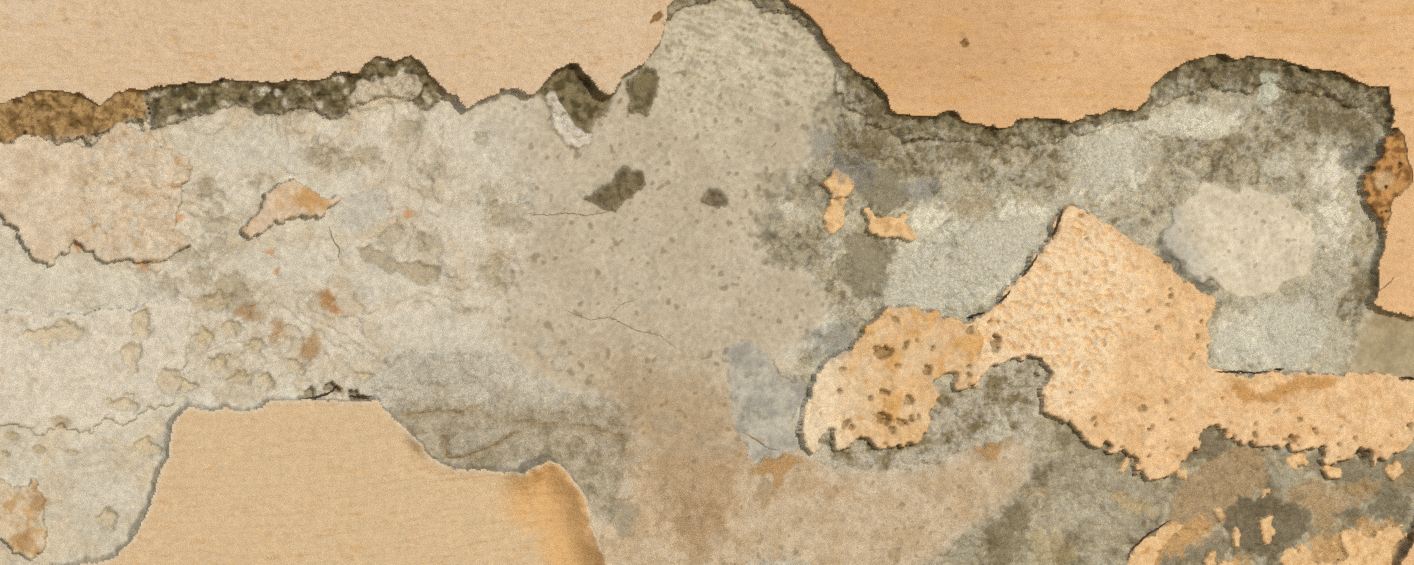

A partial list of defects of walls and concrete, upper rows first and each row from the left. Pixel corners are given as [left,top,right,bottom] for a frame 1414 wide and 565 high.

damp [1073,130,1147,190]
flaking render [0,54,638,565]
spalling [472,0,1414,565]
damp [885,216,1039,312]
damp [1159,241,1211,290]
damp [756,455,799,486]